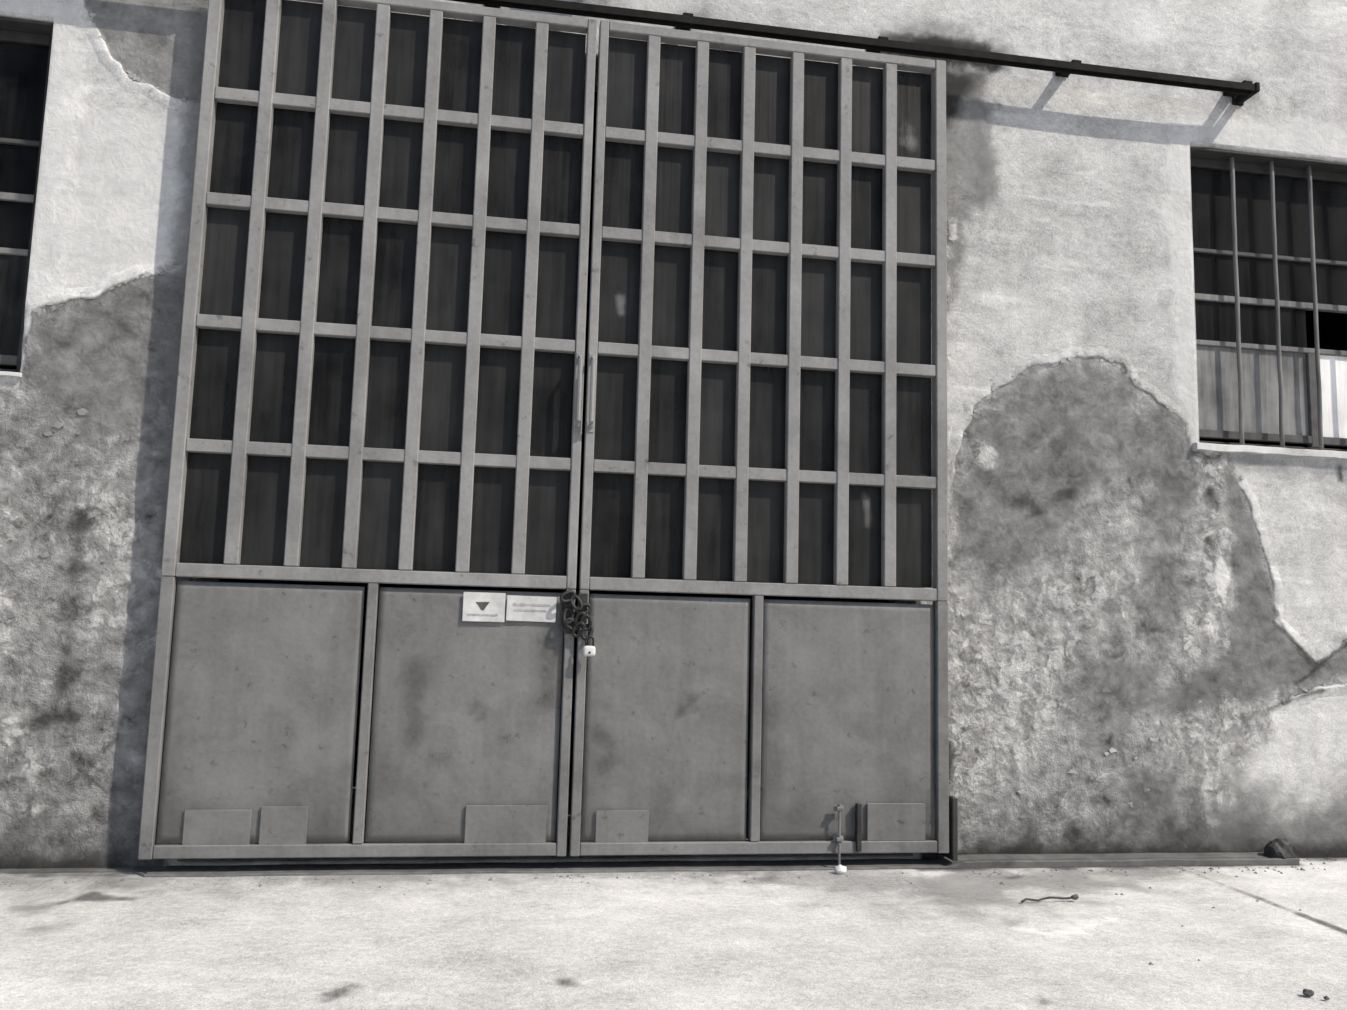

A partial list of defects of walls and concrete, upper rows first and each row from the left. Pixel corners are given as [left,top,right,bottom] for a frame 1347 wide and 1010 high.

peeling [71,0,209,114]
damp [881,27,1002,324]
peeling [947,219,957,261]
spalling [0,259,183,865]
spalling [920,346,1347,854]